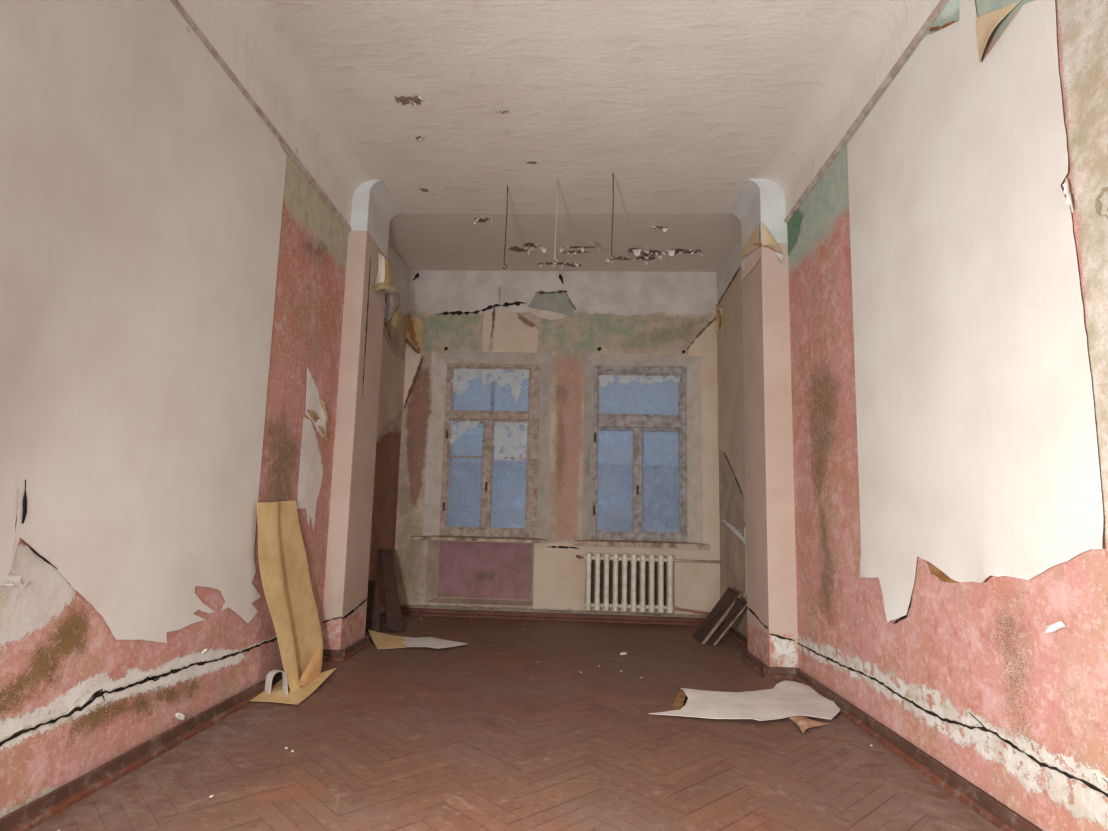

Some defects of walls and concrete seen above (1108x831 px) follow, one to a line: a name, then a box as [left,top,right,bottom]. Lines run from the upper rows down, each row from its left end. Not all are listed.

crack [435,286,525,315]
flaking render [528,290,576,321]
peeling [507,240,703,269]
peeling [297,367,327,531]
peeling [404,366,432,510]
water stain [808,361,842,628]
flaking render [0,543,76,652]
water stain [0,595,97,714]
flaking render [0,647,247,750]
crack [0,636,277,747]
crack [747,607,1108,798]
flaking render [770,635,1108,831]